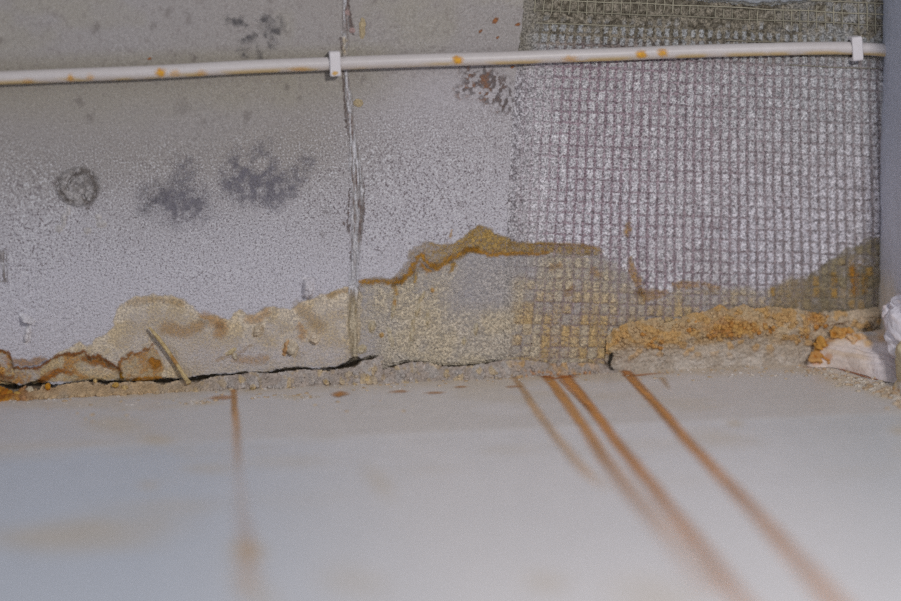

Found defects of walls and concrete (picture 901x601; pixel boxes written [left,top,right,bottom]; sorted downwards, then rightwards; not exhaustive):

water stain [156,181,205,217]
crack [0,0,492,389]
water stain [224,157,297,203]
corrosion [0,344,164,384]
corrosion [214,390,238,421]
flaking render [0,293,901,402]
corrosion [542,375,702,544]
corrosion [622,370,750,503]